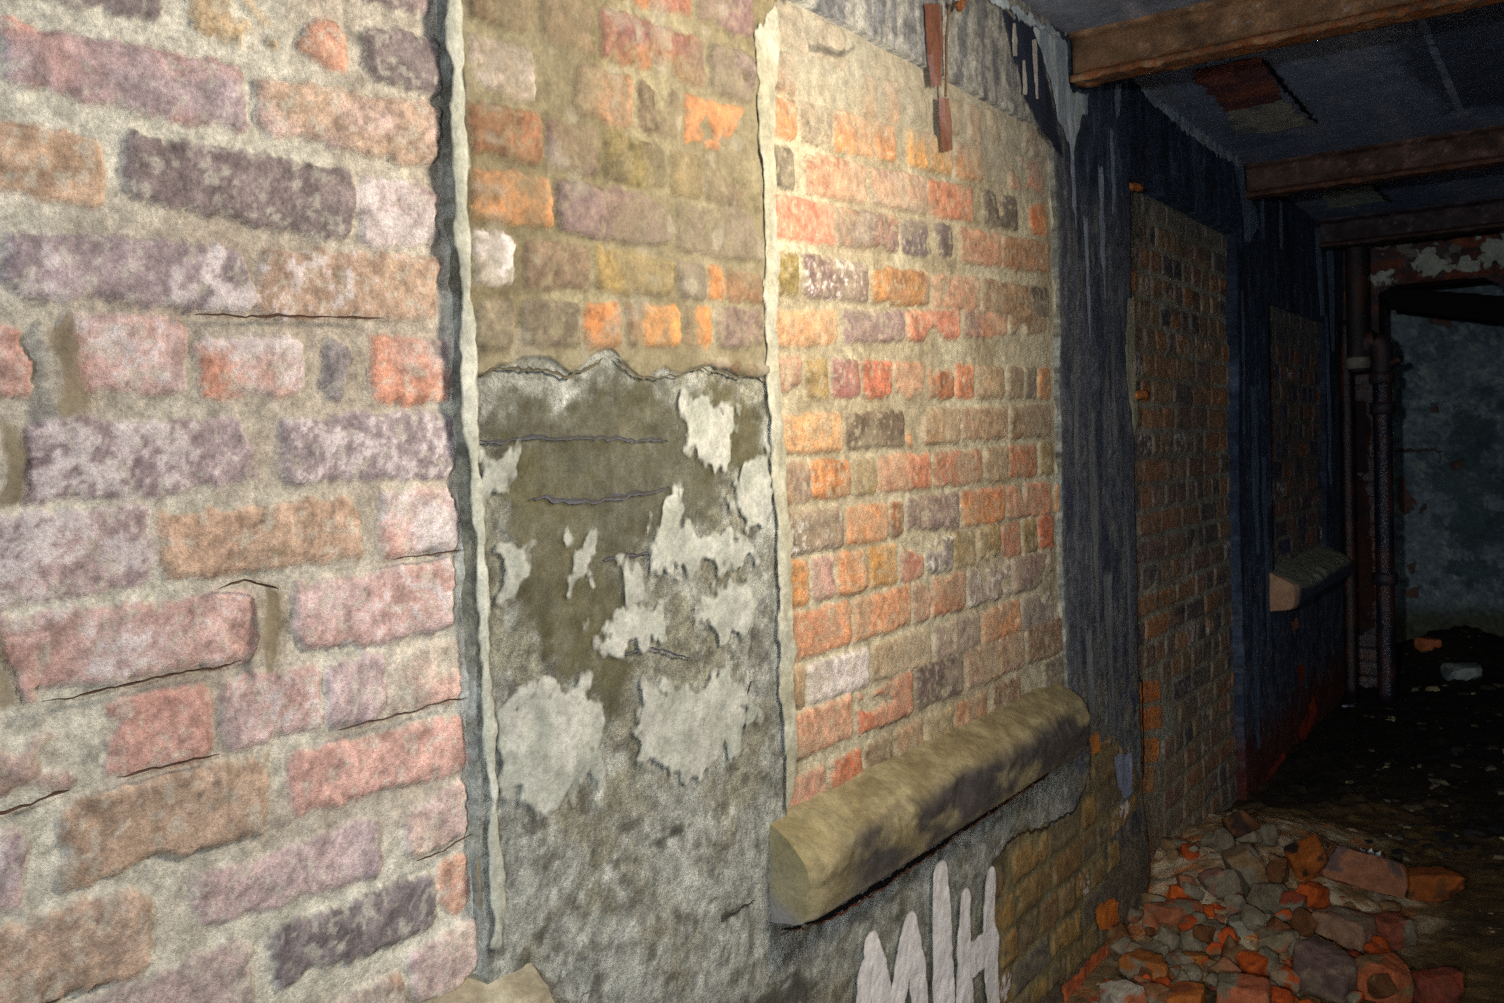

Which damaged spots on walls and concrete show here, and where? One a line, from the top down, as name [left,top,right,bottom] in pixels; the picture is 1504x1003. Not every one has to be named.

peeling [1367,230,1504,286]
leakage [498,366,763,717]
spalling [993,296,1361,1003]
spalling [1414,637,1442,652]
crack [780,772,1051,936]
crack [718,900,754,922]
spalling [1345,935,1391,959]
spalling [1346,966,1464,1003]